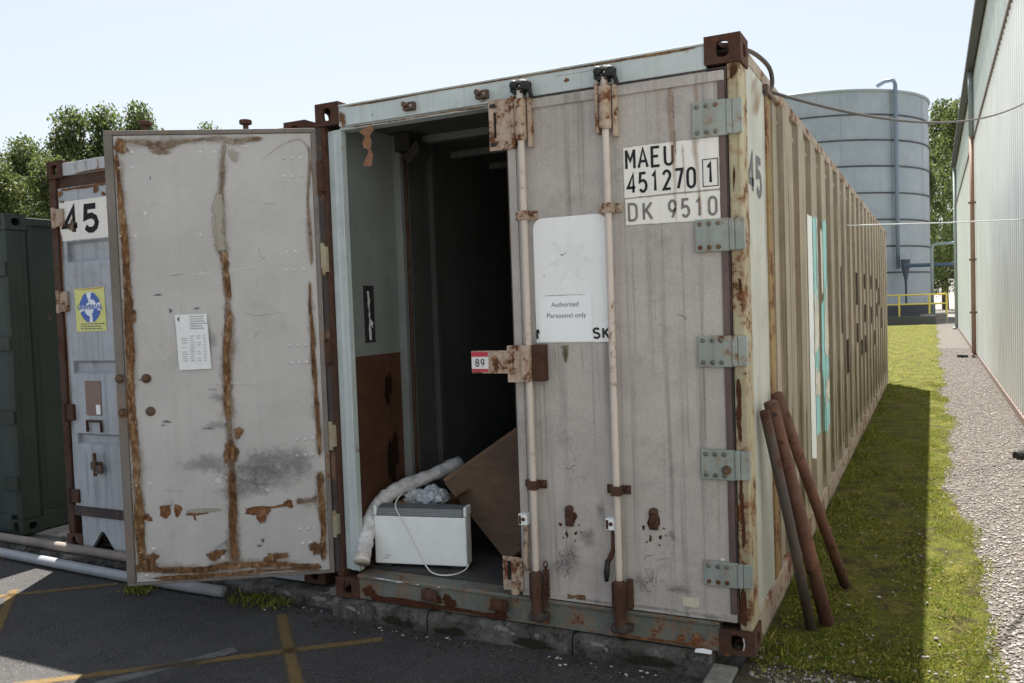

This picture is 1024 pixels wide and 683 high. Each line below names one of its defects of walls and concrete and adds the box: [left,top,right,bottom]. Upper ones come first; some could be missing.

corrosion [339,47,694,128]
peeling [211,194,226,251]
corrosion [58,137,327,580]
corrosion [362,586,509,620]
corrosion [615,632,731,656]